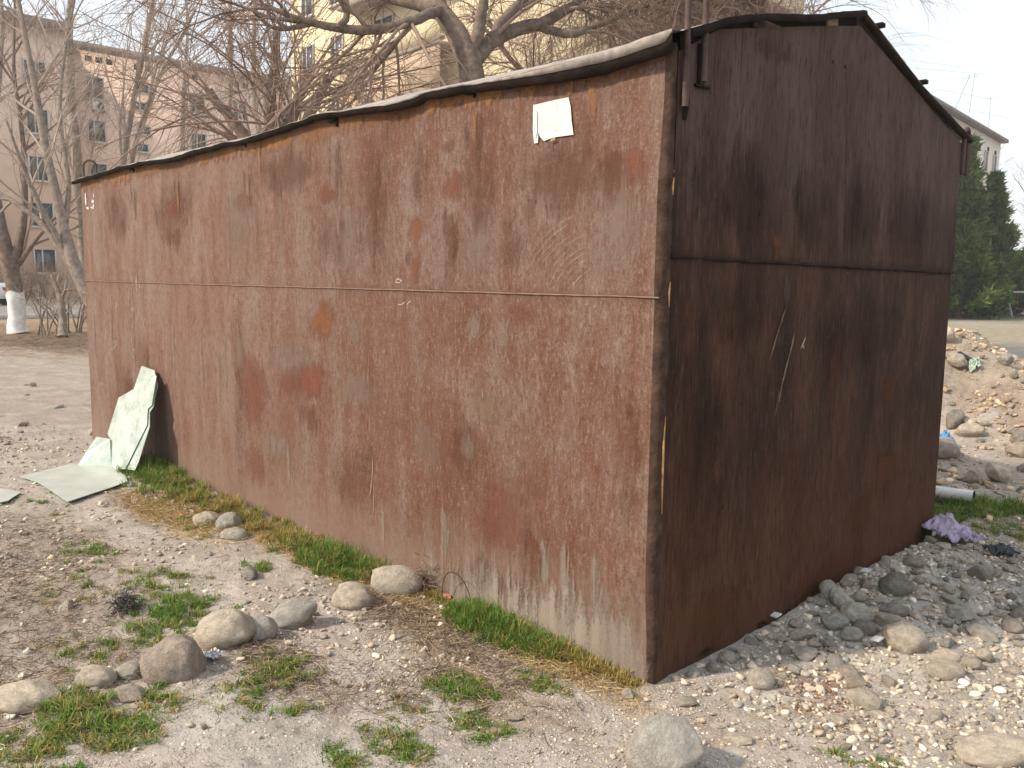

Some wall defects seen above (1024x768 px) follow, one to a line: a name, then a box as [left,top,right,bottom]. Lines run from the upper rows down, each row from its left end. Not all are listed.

rust [422,58,629,133]
rust [81,164,163,190]
rust [198,131,290,175]
rust [523,529,543,584]
leakage [420,512,645,683]